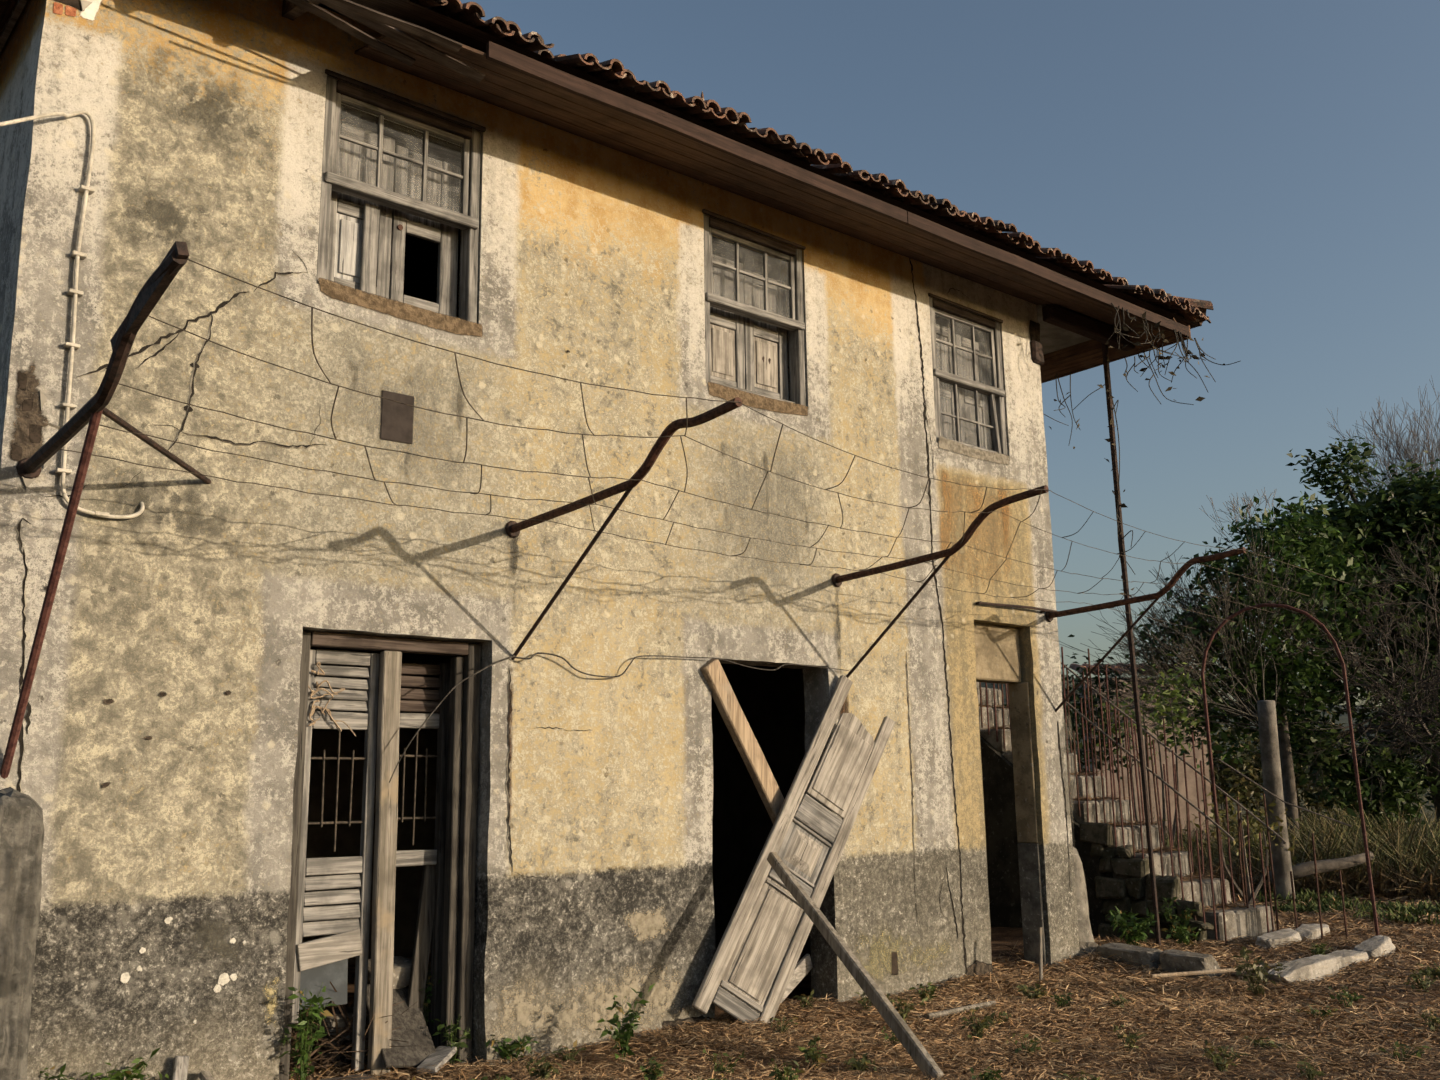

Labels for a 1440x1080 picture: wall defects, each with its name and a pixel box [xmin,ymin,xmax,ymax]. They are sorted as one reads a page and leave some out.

spalling [53,0,102,21]
crack [16,250,325,793]
crack [905,258,980,976]